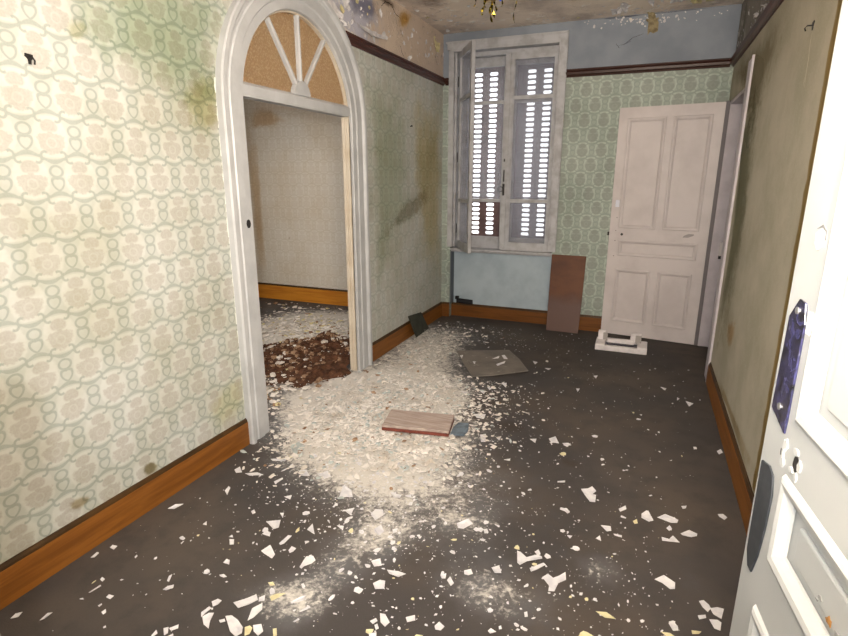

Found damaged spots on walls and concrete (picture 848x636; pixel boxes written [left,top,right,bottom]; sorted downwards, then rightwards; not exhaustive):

peeling [328,0,395,42]